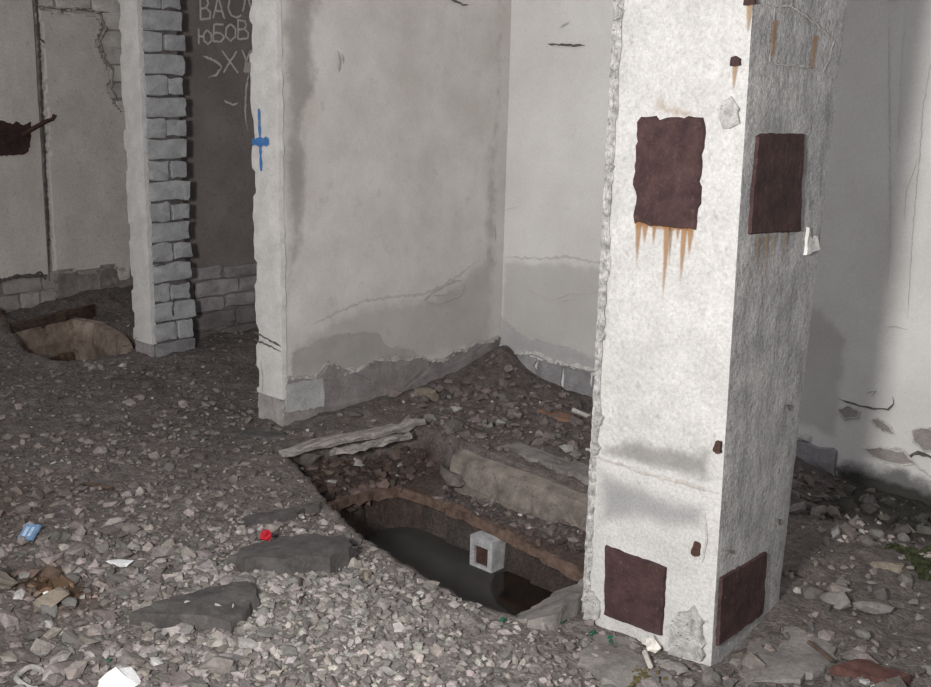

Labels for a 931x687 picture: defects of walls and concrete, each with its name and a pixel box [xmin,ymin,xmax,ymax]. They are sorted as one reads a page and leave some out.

peeling [38,6,118,101]
rust [636,222,693,282]
spalling [282,335,502,426]
spalling [871,418,895,434]